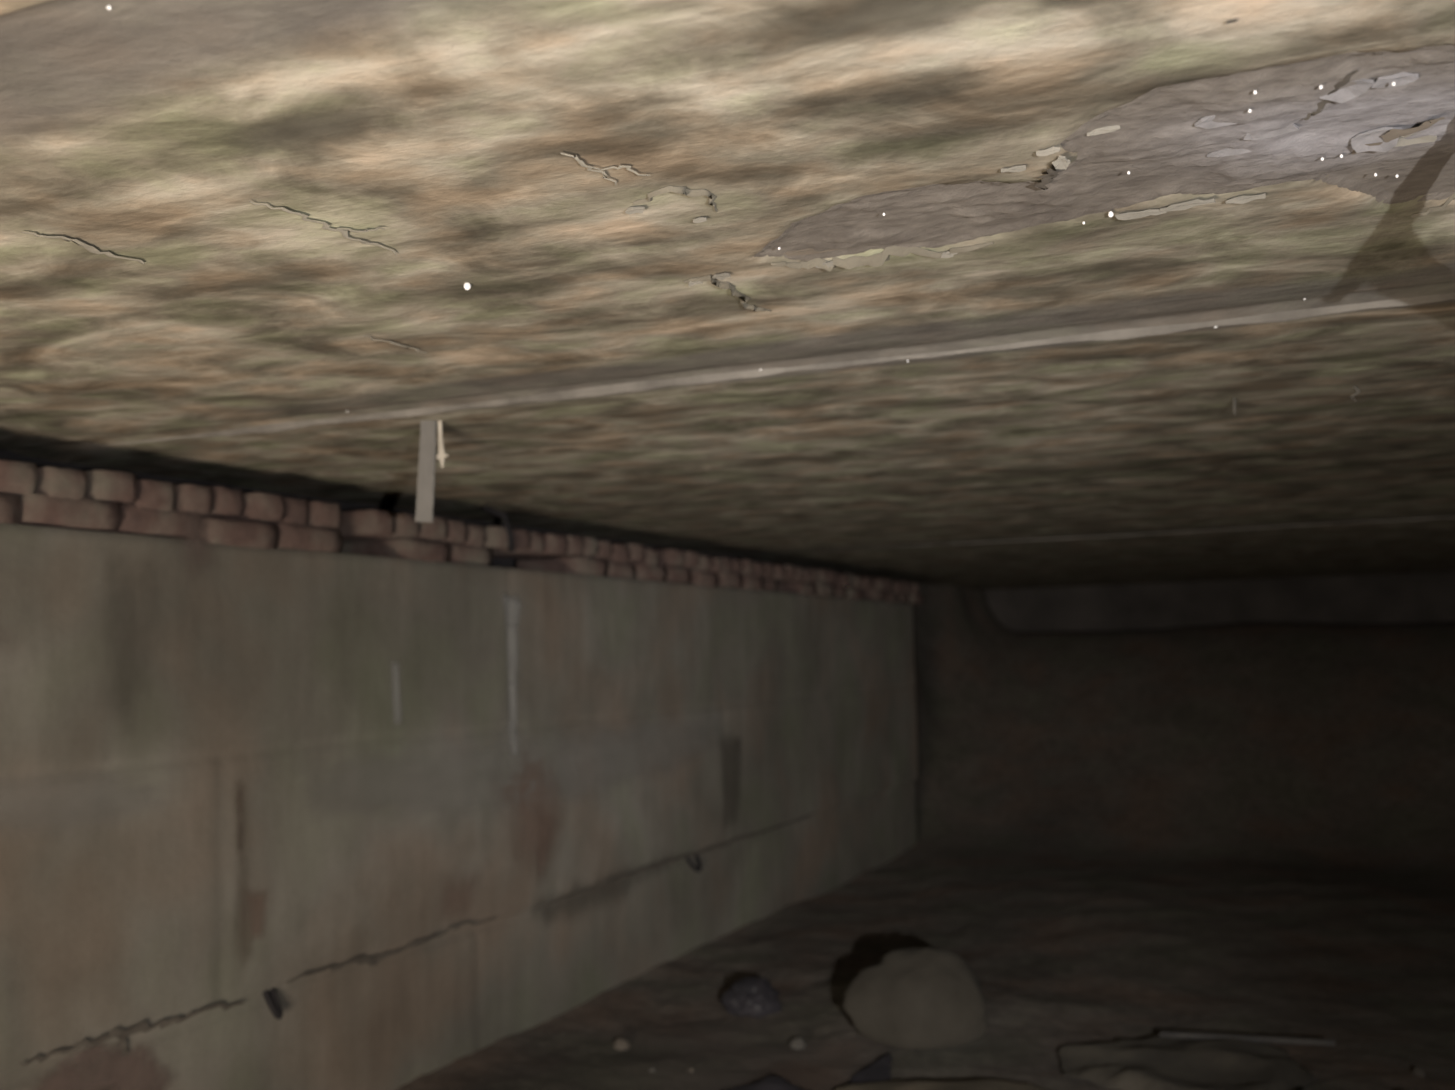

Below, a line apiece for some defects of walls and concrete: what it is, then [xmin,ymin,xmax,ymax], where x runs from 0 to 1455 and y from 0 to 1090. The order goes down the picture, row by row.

spalling [753,44,1455,272]
peeling [683,273,772,312]
crack [287,918,496,983]
crack [20,1002,244,1067]